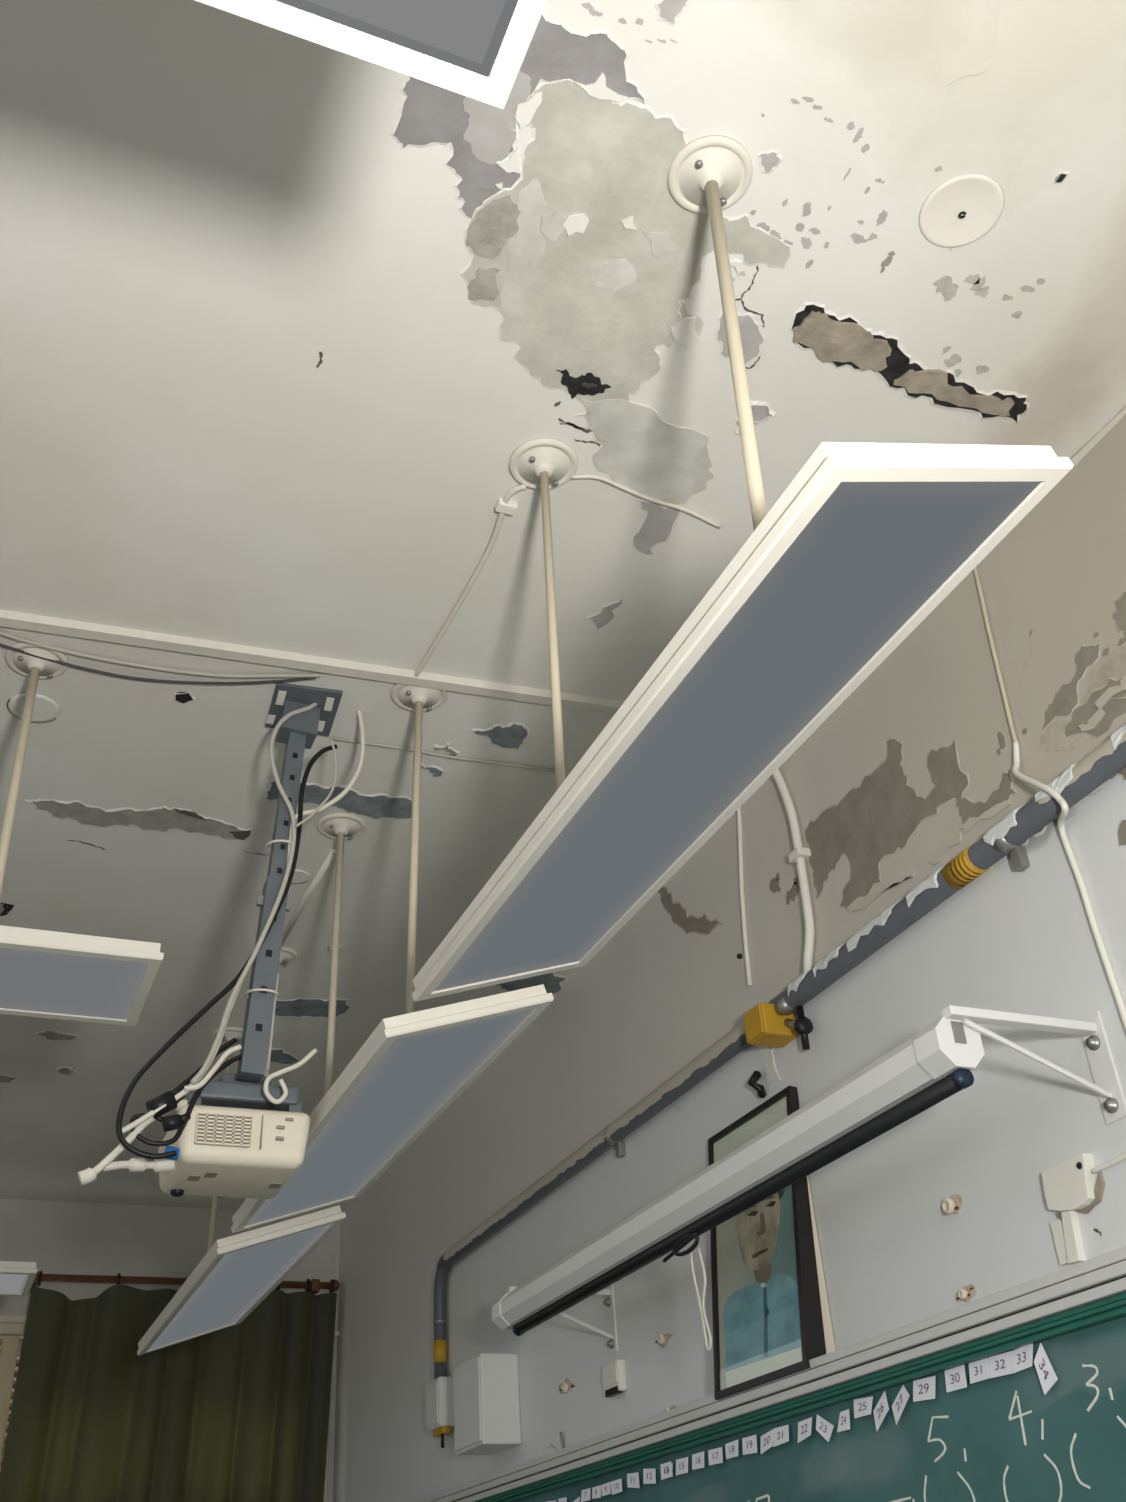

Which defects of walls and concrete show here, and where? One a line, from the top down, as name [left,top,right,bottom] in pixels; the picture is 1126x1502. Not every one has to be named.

peeling [791,97,870,153]
peeling [390,0,831,555]
peeling [933,273,1045,319]
spalling [788,301,1030,424]
peeling [1022,590,1126,750]
spalling [471,721,531,750]
spalling [25,799,254,840]
spalling [297,781,412,820]
peeling [1116,817,1126,848]
peeling [769,732,1077,997]
peeling [658,885,722,935]
spalling [495,972,568,997]